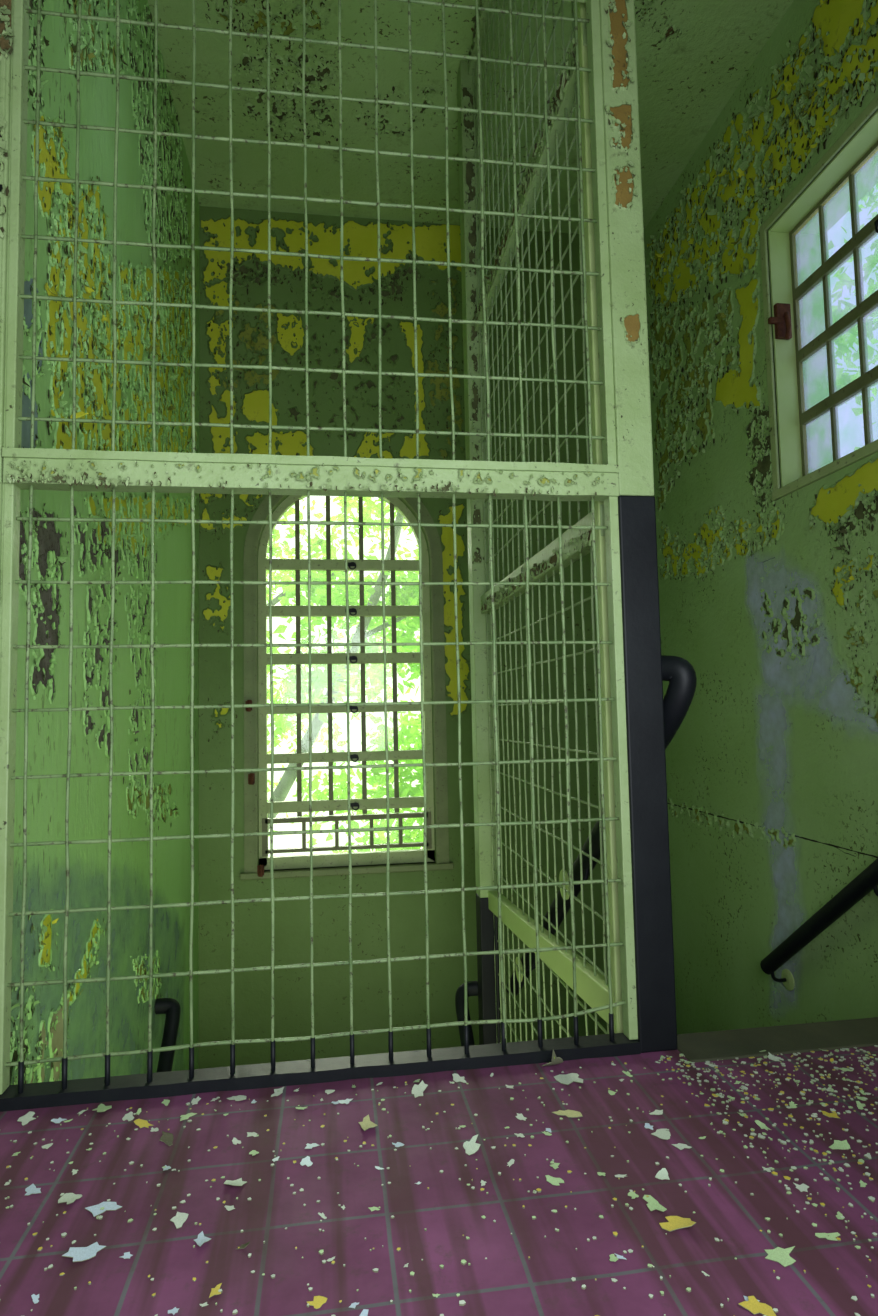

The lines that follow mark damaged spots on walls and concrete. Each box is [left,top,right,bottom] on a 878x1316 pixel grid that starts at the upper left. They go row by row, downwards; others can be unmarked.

peeling [604,0,688,211]
peeling [620,0,878,583]
peeling [0,0,605,831]
damp [749,579,847,775]
peeling [759,457,878,727]
peeling [10,909,107,1085]
peeling [130,948,163,1006]